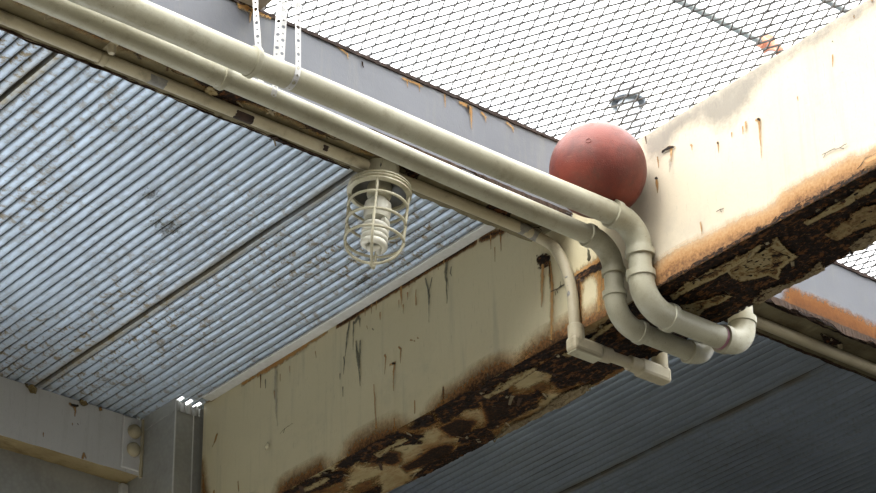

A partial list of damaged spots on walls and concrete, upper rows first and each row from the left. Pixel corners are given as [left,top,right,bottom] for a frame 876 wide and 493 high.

corrosion [238,4,271,21]
corrosion [653,146,876,288]
water stain [343,315,361,380]
corrosion [427,253,569,413]
peeling [565,256,605,318]
corrosion [580,305,608,328]
peeling [585,319,663,360]
peeling [628,301,659,329]
peeling [657,170,876,349]
peeling [283,337,624,493]